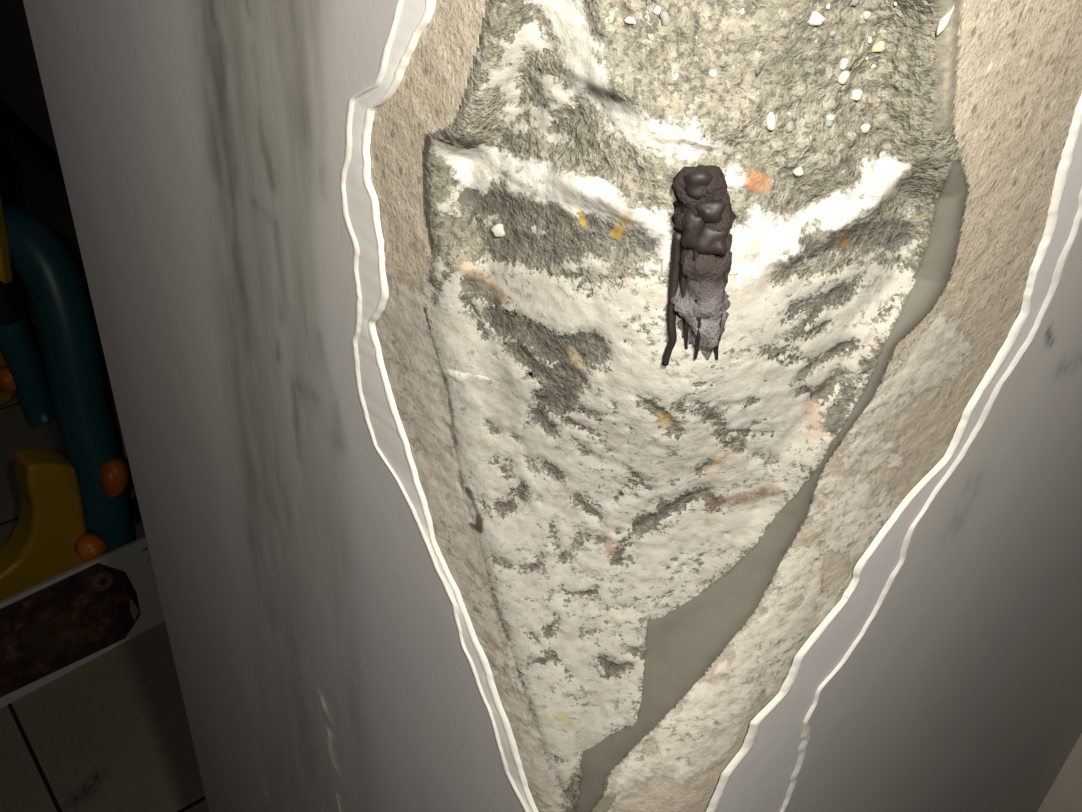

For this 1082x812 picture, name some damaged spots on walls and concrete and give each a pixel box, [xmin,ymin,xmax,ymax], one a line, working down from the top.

spalling [341,0,1082,812]